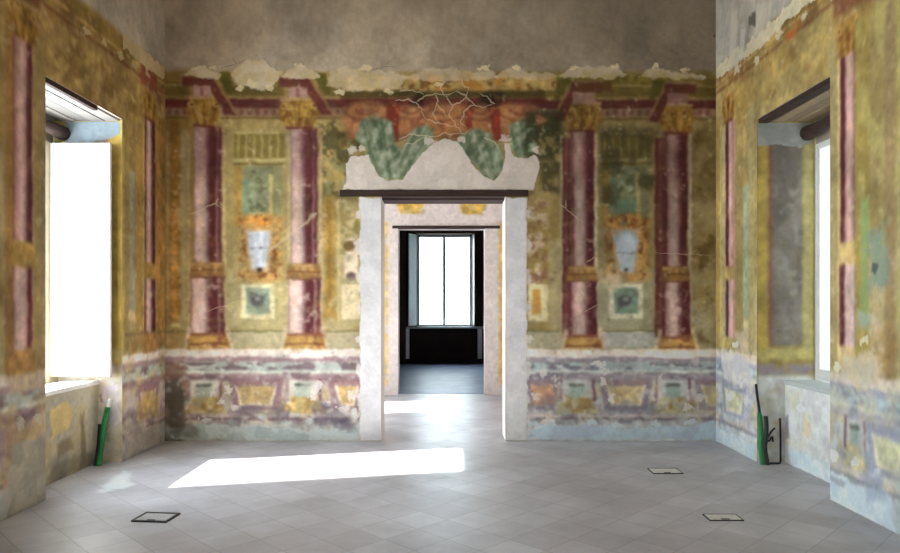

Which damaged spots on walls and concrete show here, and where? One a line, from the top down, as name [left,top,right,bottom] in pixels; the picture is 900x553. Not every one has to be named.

peeling [116,32,165,80]
peeling [184,0,816,96]
crack [395,80,499,149]
spalling [169,134,755,460]